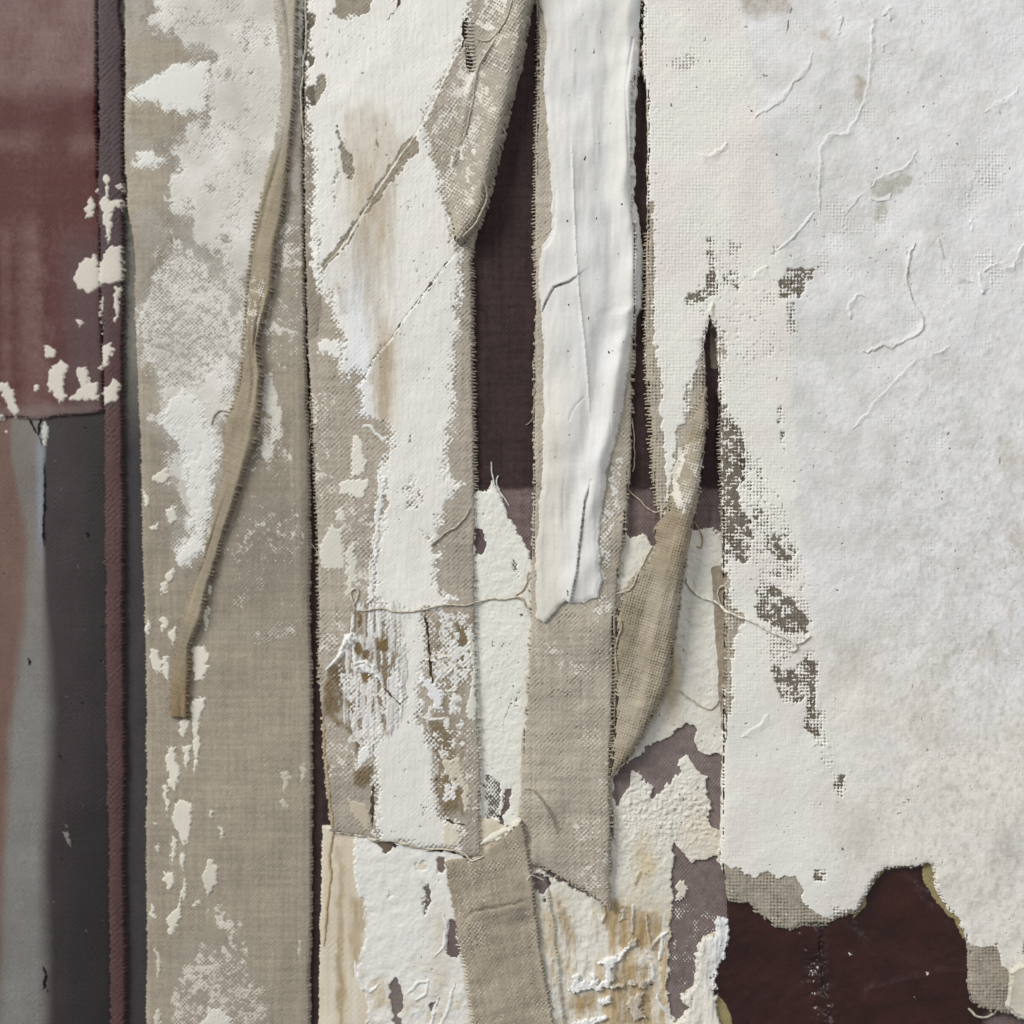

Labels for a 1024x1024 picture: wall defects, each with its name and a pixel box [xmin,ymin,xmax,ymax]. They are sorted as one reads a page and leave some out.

peeling [34,174,126,405]
peeling [0,382,20,433]
peeling [473,528,487,555]
peeling [145,616,177,682]
peeling [191,645,210,681]
peeling [325,662,397,781]
peeling [149,696,270,1024]
peeling [419,607,520,960]
spalling [570,718,724,892]
peeling [389,977,403,1024]
spalling [501,843,840,1024]
peeling [966,942,1024,1019]